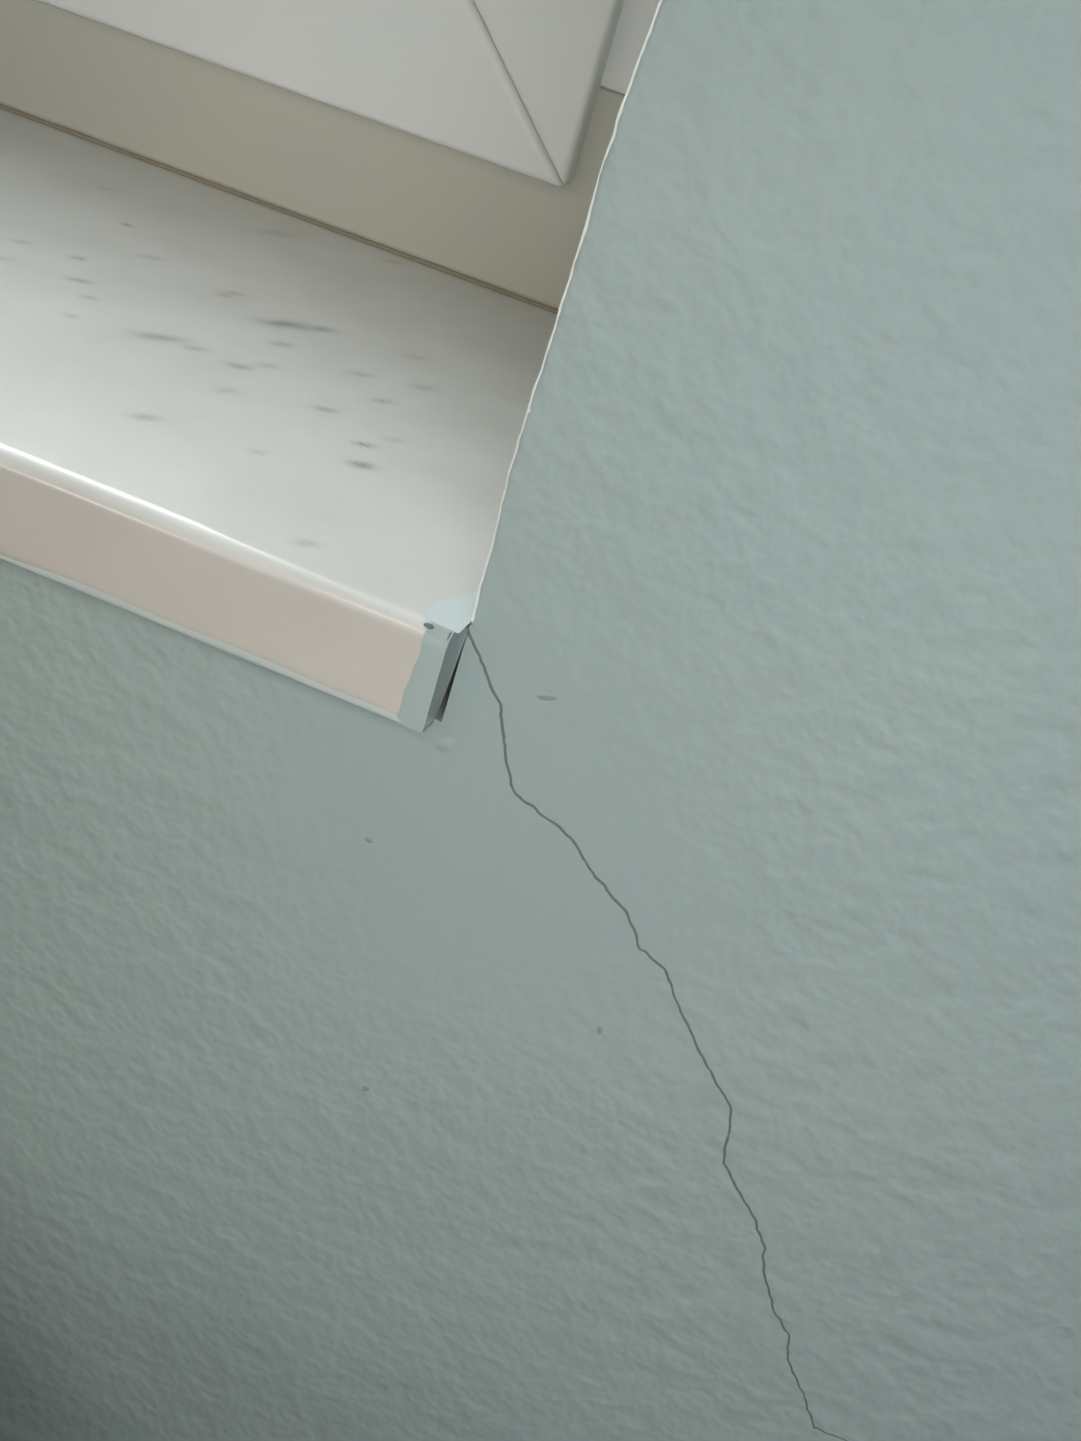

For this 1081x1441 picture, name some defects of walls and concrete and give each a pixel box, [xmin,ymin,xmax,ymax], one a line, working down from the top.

crack [466,625,848,1441]